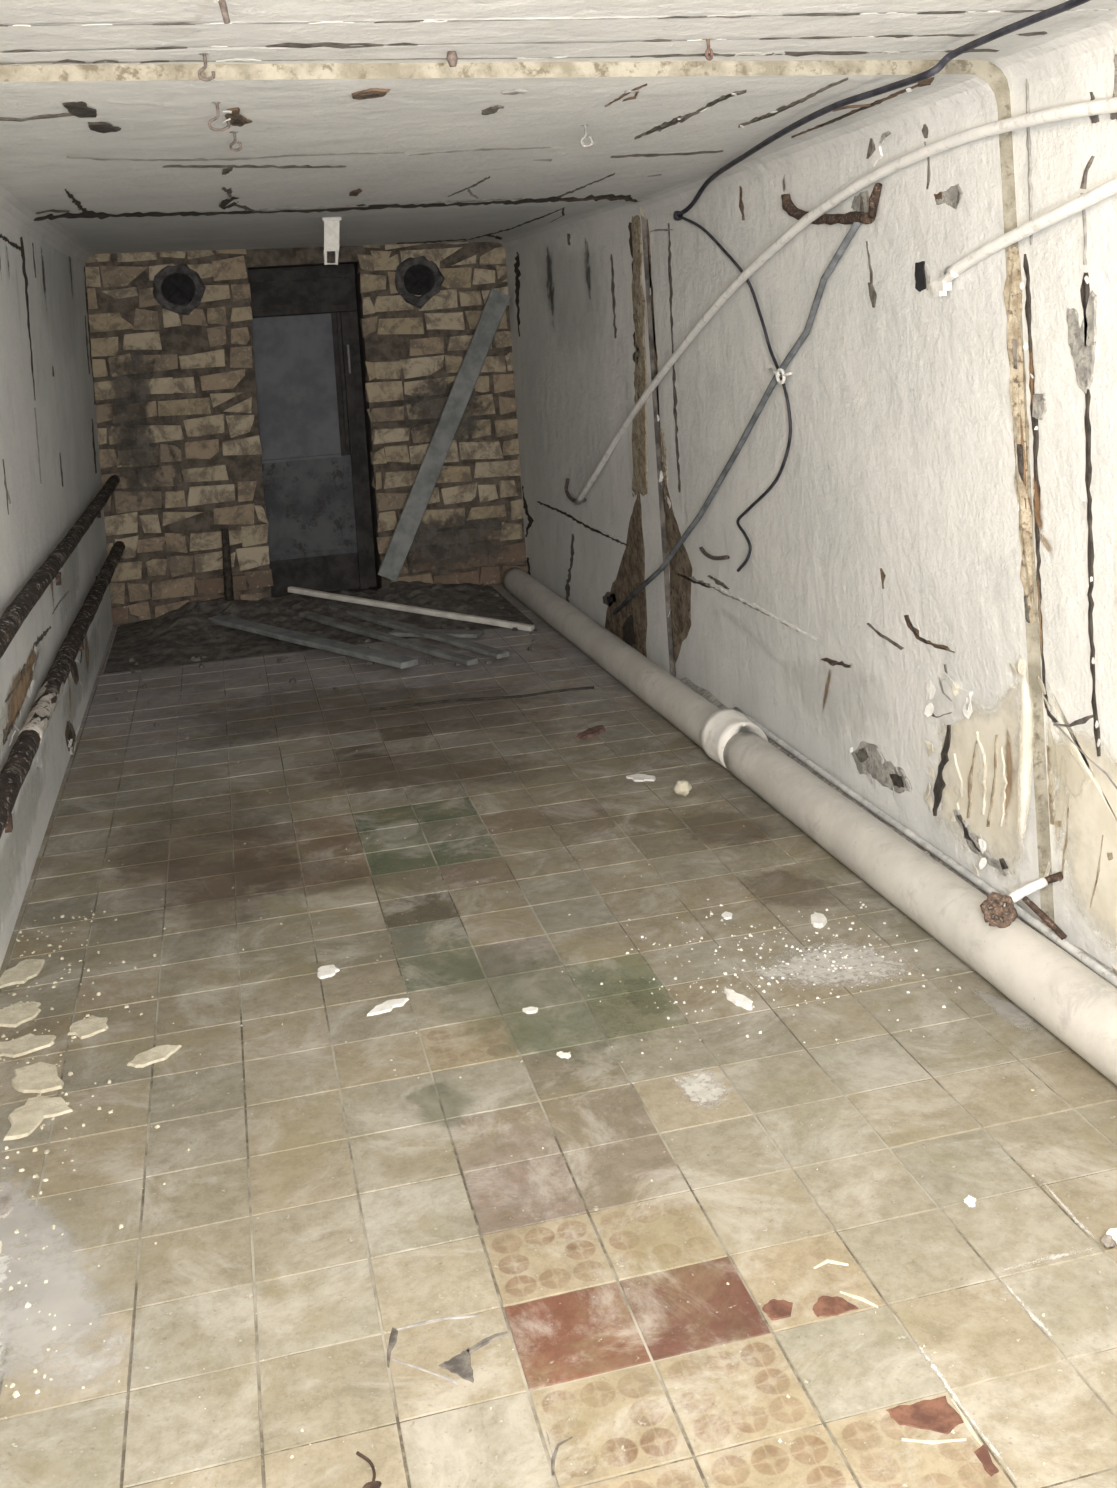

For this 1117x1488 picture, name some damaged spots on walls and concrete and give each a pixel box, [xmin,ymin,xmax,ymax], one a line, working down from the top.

peeling [3,591,69,746]
peeling [850,658,1117,943]